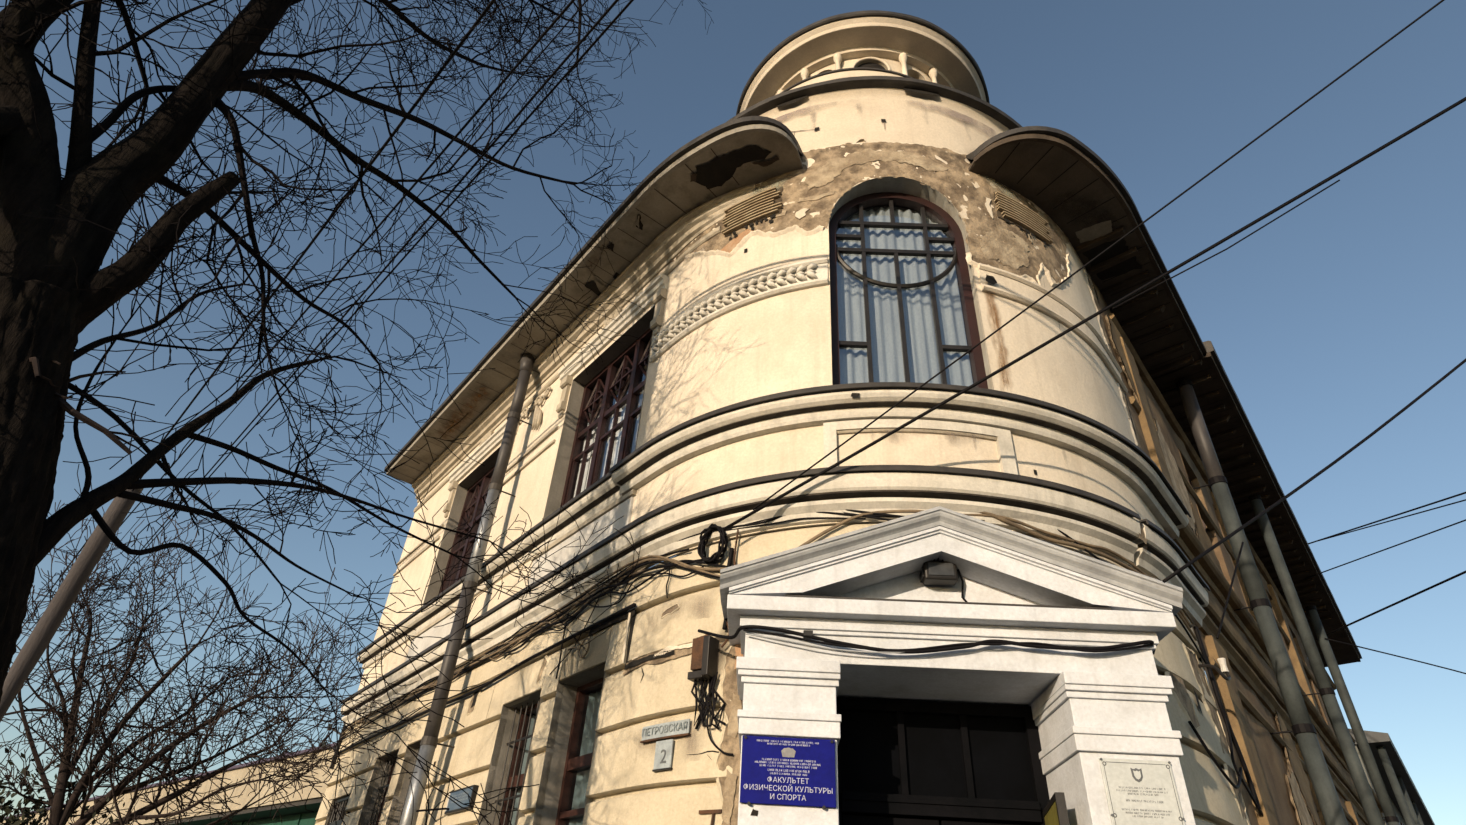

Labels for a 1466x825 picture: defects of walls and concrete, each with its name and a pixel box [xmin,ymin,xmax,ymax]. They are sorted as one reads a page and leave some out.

spalling [664,119,1147,450]
peeling [1153,417,1223,595]